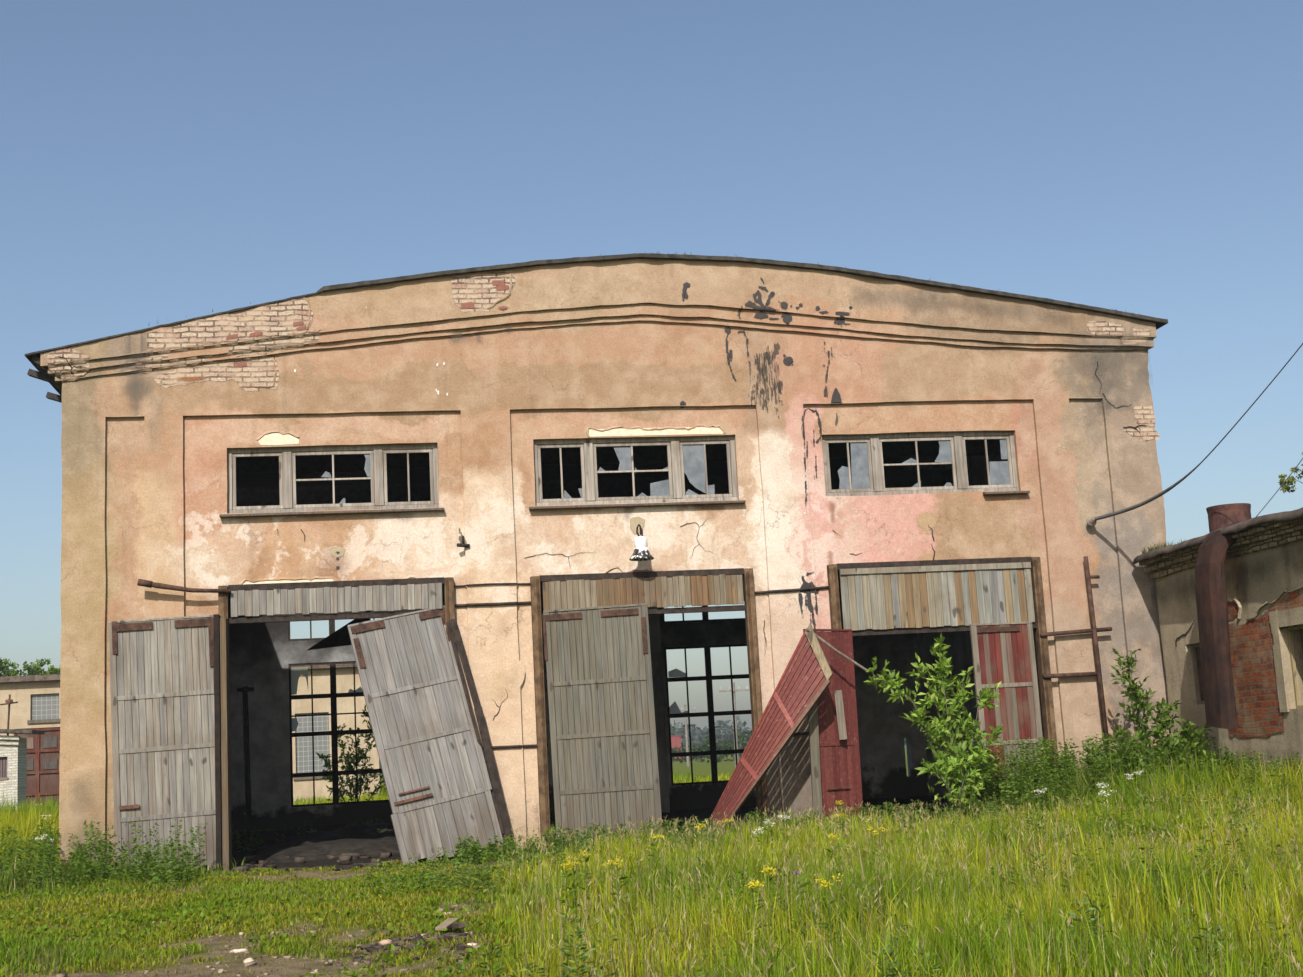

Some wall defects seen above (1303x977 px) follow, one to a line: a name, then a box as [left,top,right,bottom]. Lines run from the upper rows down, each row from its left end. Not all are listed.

spalling [451,271,515,313]
spalling [134,297,321,391]
peeling [586,424,726,437]
leakage [750,343,782,417]
crack [1095,361,1149,435]
spalling [1124,405,1160,441]
peeling [239,546,345,585]
spalling [1227,585,1303,738]